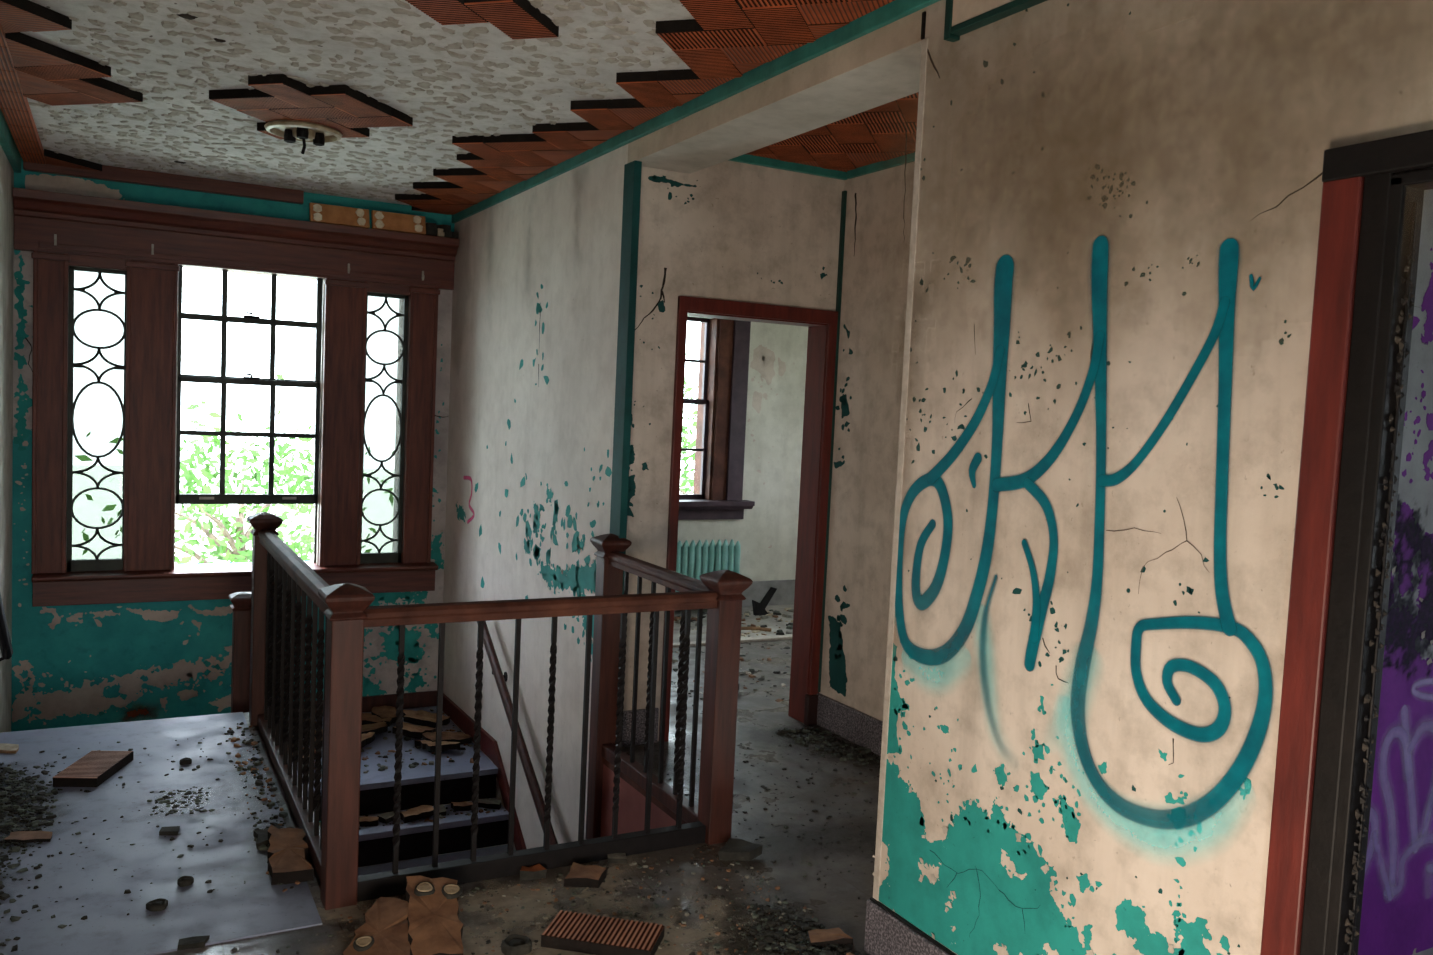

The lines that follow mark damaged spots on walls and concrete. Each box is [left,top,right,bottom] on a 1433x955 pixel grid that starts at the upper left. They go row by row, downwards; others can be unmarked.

peeling [648,175,701,204]
peeling [906,370,984,464]
peeling [1009,326,1082,415]
peeling [498,419,612,597]
peeling [12,604,233,725]
peeling [828,585,850,697]
peeling [1038,601,1069,667]
damp [1383,495,1433,679]
peeling [1358,502,1433,955]
peeling [872,643,1116,955]
peeling [1165,774,1188,810]
peeling [1115,822,1240,955]